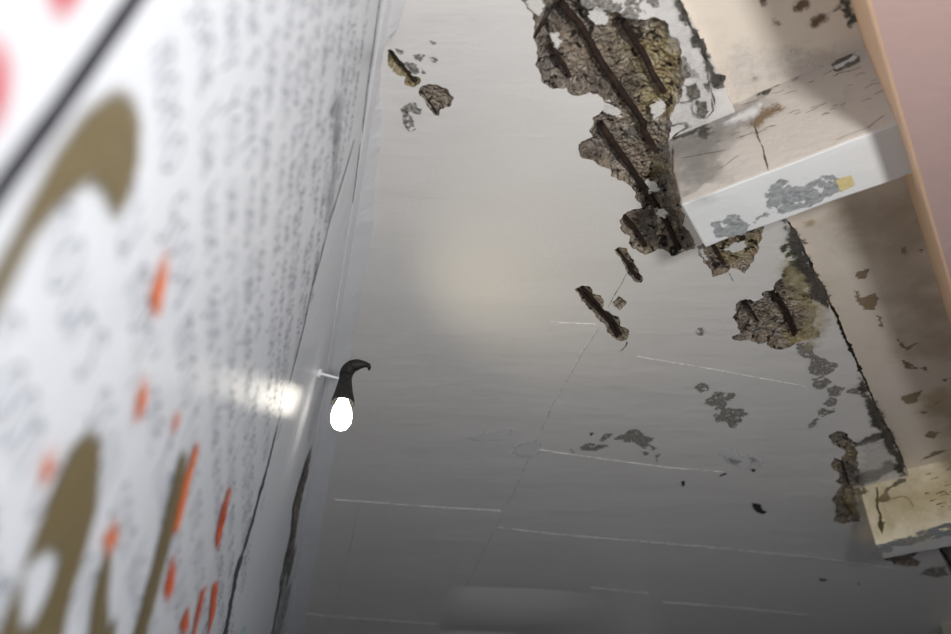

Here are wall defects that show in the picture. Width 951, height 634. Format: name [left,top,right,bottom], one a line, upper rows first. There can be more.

damp [840,0,857,28]
spalling [387,49,454,132]
damp [727,85,777,123]
spalling [522,0,840,283]
damp [672,124,711,140]
spalling [575,286,629,341]
spalling [732,278,860,428]
peeling [695,383,748,428]
peeling [570,429,660,461]
spalling [829,431,906,524]